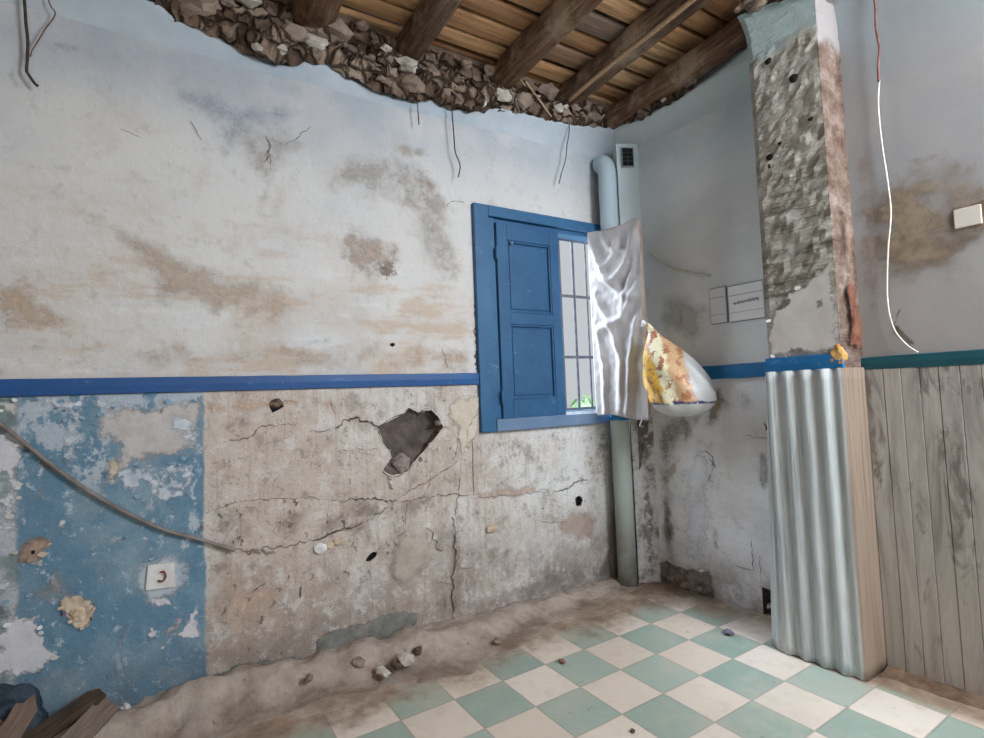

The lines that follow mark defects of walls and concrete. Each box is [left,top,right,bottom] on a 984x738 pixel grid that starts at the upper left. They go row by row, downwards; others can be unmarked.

spalling [148,0,611,128]
spalling [621,79,698,124]
leakage [345,235,396,276]
leakage [864,179,984,272]
flaking render [766,262,848,364]
peeling [0,435,50,530]
peeling [33,398,203,501]
spalling [309,396,480,490]
crack [207,442,588,619]
spalling [642,493,714,598]
peeling [0,581,59,676]
peeling [25,578,96,630]